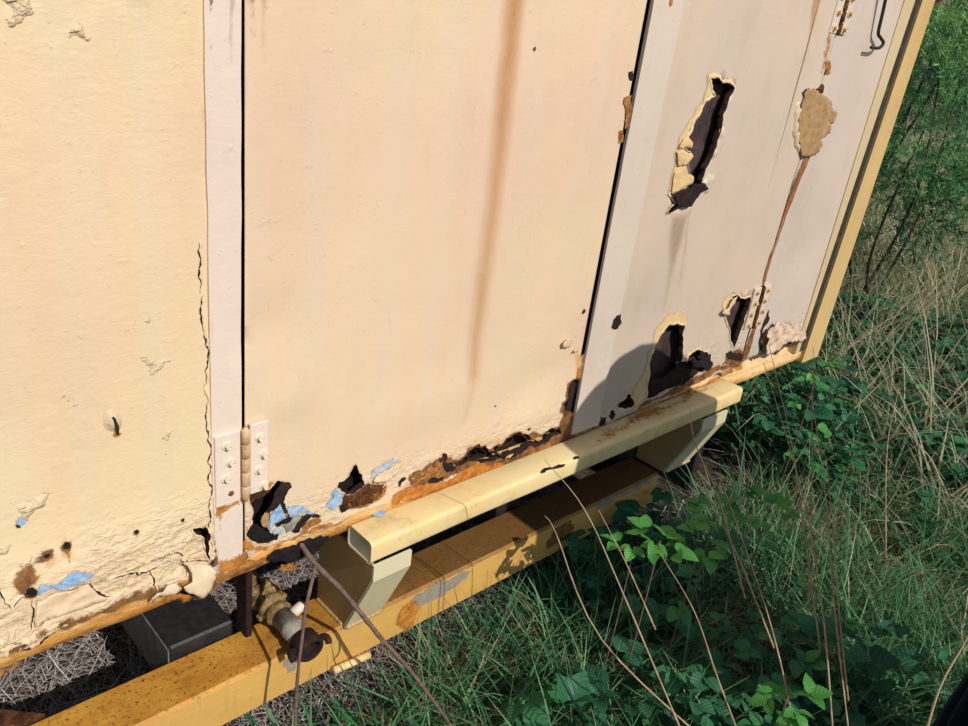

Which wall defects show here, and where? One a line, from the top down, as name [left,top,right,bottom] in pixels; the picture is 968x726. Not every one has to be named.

rust [504,0,518,99]
spalling [671,79,729,204]
rust [763,156,810,282]
crack [91,242,215,597]
spalling [250,481,281,531]
rust [0,379,577,677]
peeling [338,457,403,491]
spalling [450,434,530,458]
spalling [648,324,700,386]
rust [598,327,757,441]
spalling [722,296,746,341]
peeling [152,563,217,602]